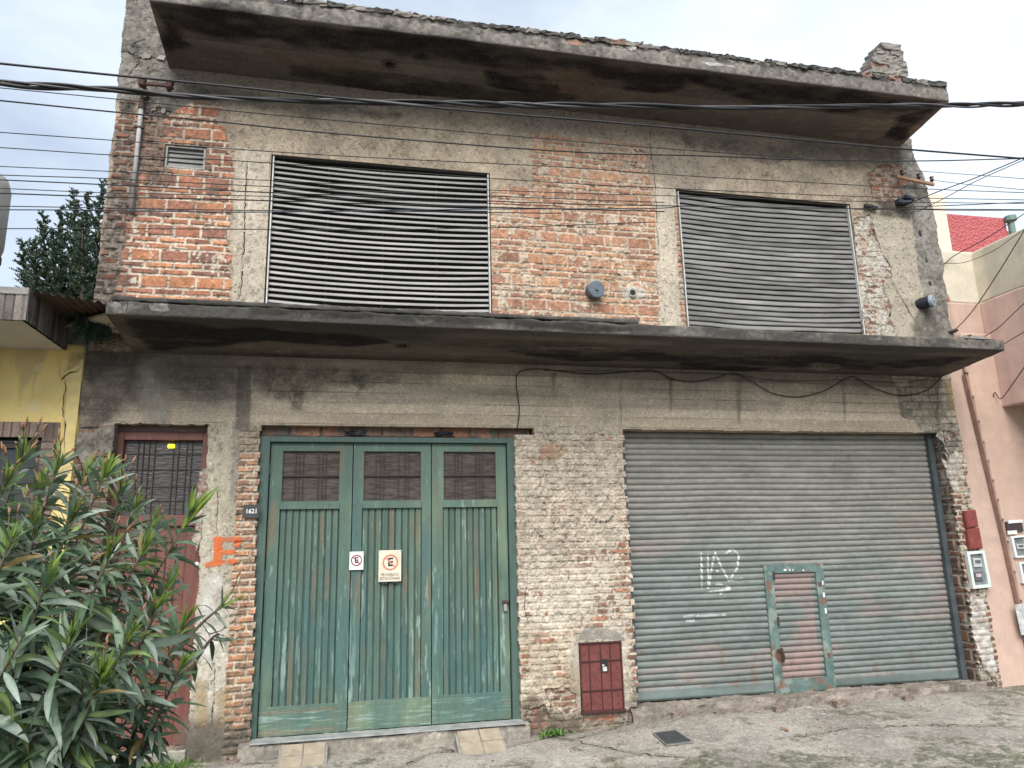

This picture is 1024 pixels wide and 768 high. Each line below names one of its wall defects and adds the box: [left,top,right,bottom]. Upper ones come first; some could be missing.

peeling [143,106,171,121]
water stain [162,2,935,165]
spalling [868,162,908,203]
spalling [853,214,895,336]
crack [61,366,81,435]
water stain [129,319,388,429]
peeling [936,431,970,495]
peeling [970,595,999,680]
spalling [525,686,635,731]